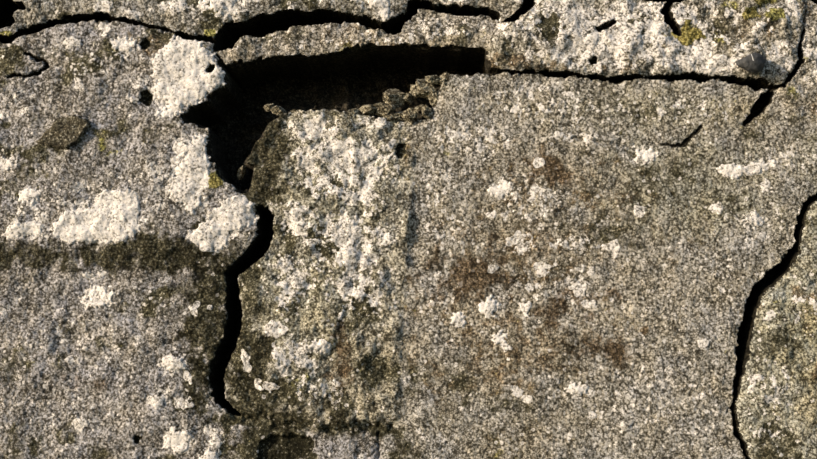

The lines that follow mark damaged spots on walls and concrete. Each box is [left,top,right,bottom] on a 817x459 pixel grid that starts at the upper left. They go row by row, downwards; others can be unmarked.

crack [0,0,535,78]
crack [490,29,805,127]
crack [642,0,685,37]
spalling [396,143,406,159]
crack [660,124,703,148]
crack [209,204,275,416]
crack [730,193,817,459]